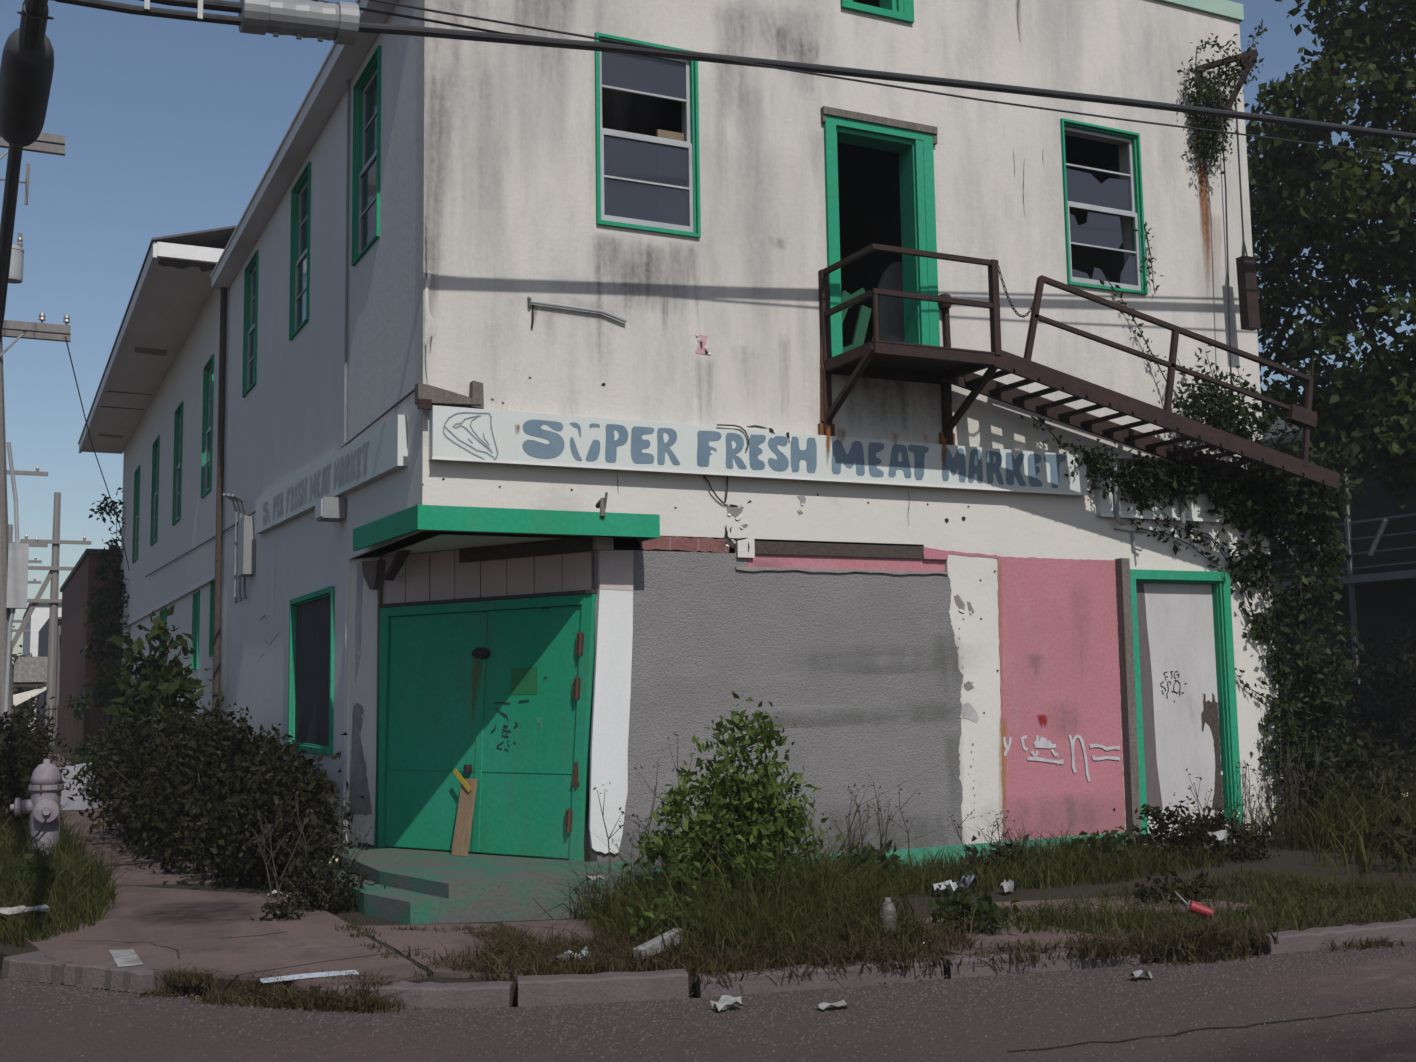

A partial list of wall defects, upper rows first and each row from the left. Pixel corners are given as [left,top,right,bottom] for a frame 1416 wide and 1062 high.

rust [1199,160,1208,235]